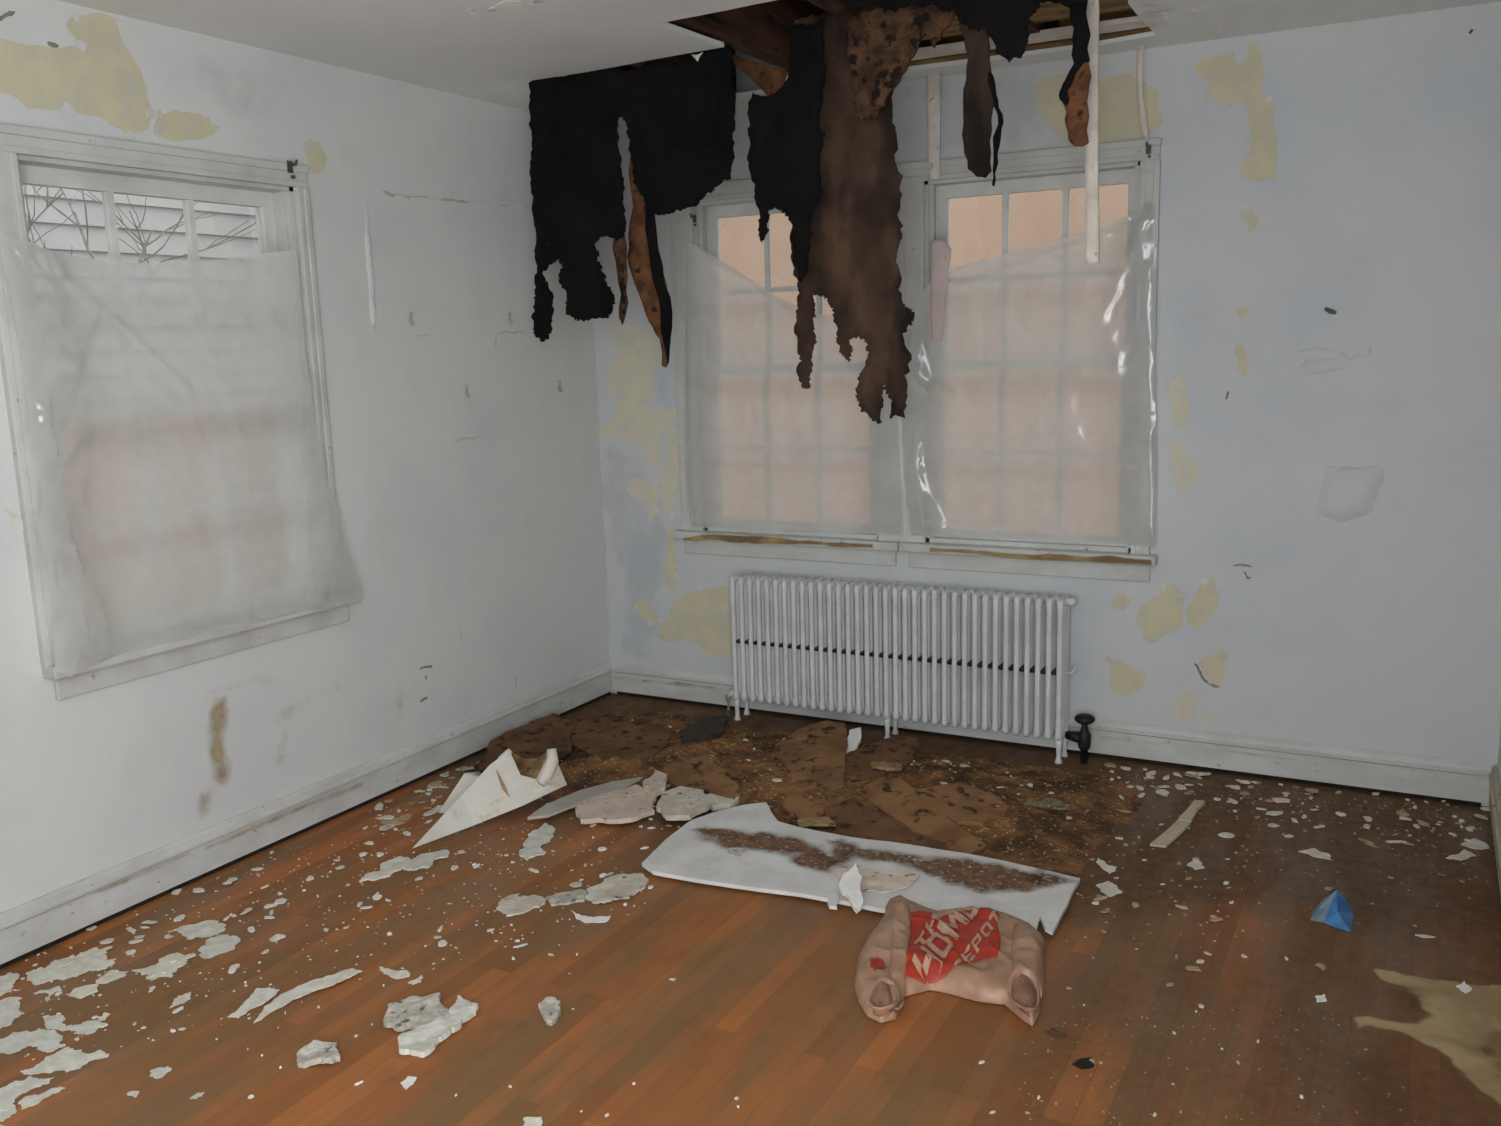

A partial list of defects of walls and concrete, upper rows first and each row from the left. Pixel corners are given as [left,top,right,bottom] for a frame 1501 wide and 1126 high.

peeling [0,11,219,142]
peeling [1032,72,1074,147]
peeling [1099,69,1164,144]
peeling [1195,40,1279,183]
peeling [598,318,732,662]
peeling [1112,577,1222,644]
peeling [1104,655,1146,696]
peeling [1172,648,1229,725]
leakage [1354,969,1501,1105]